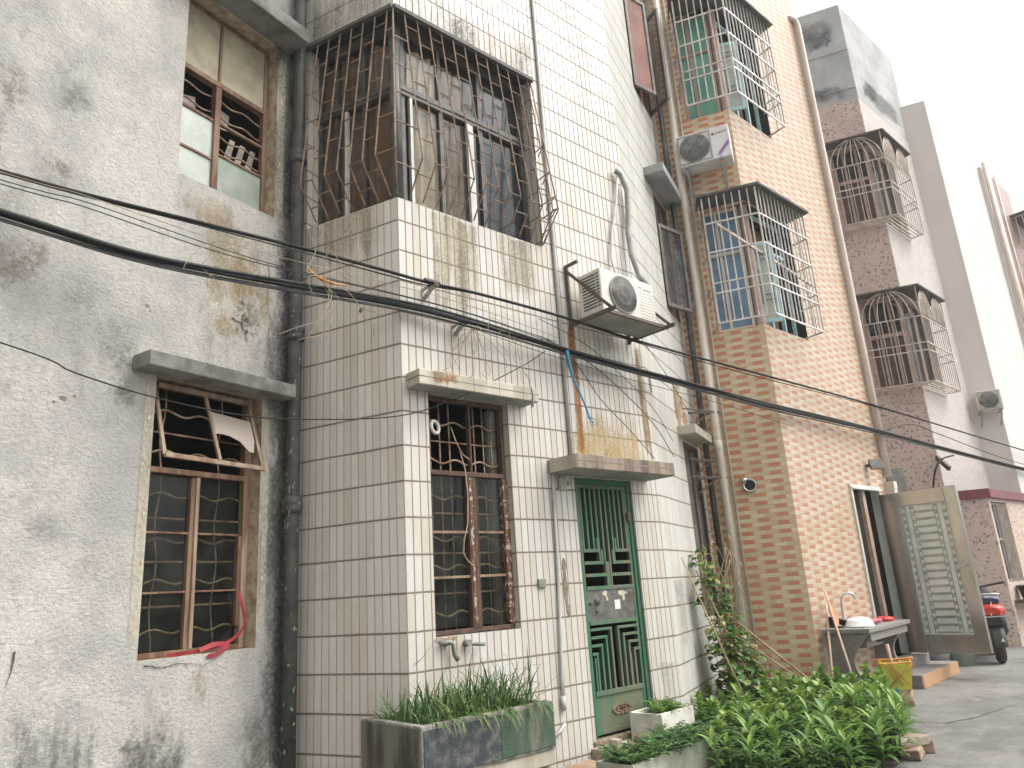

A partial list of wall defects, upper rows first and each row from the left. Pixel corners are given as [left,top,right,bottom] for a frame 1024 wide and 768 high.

water stain [209,47,293,383]
rust [568,328,653,459]
water stain [253,401,287,768]